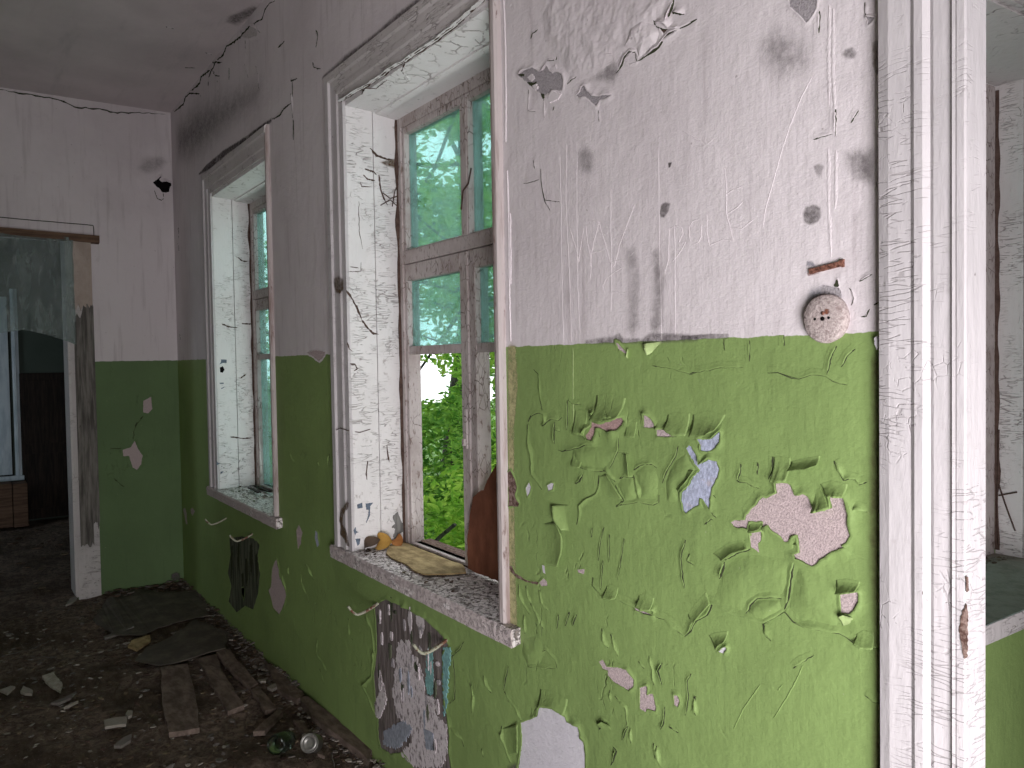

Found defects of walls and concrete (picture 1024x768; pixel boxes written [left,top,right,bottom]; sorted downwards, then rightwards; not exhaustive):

crack [0,0,284,114]
spalling [515,59,617,115]
corrosion [808,259,845,275]
peeling [507,468,533,510]
peeling [572,393,727,521]
peeling [227,533,287,618]
peeling [509,505,569,588]
peeling [713,456,874,650]
peeling [372,591,455,768]
peeling [503,689,591,768]
peeling [597,656,684,718]
peeling [709,631,732,658]